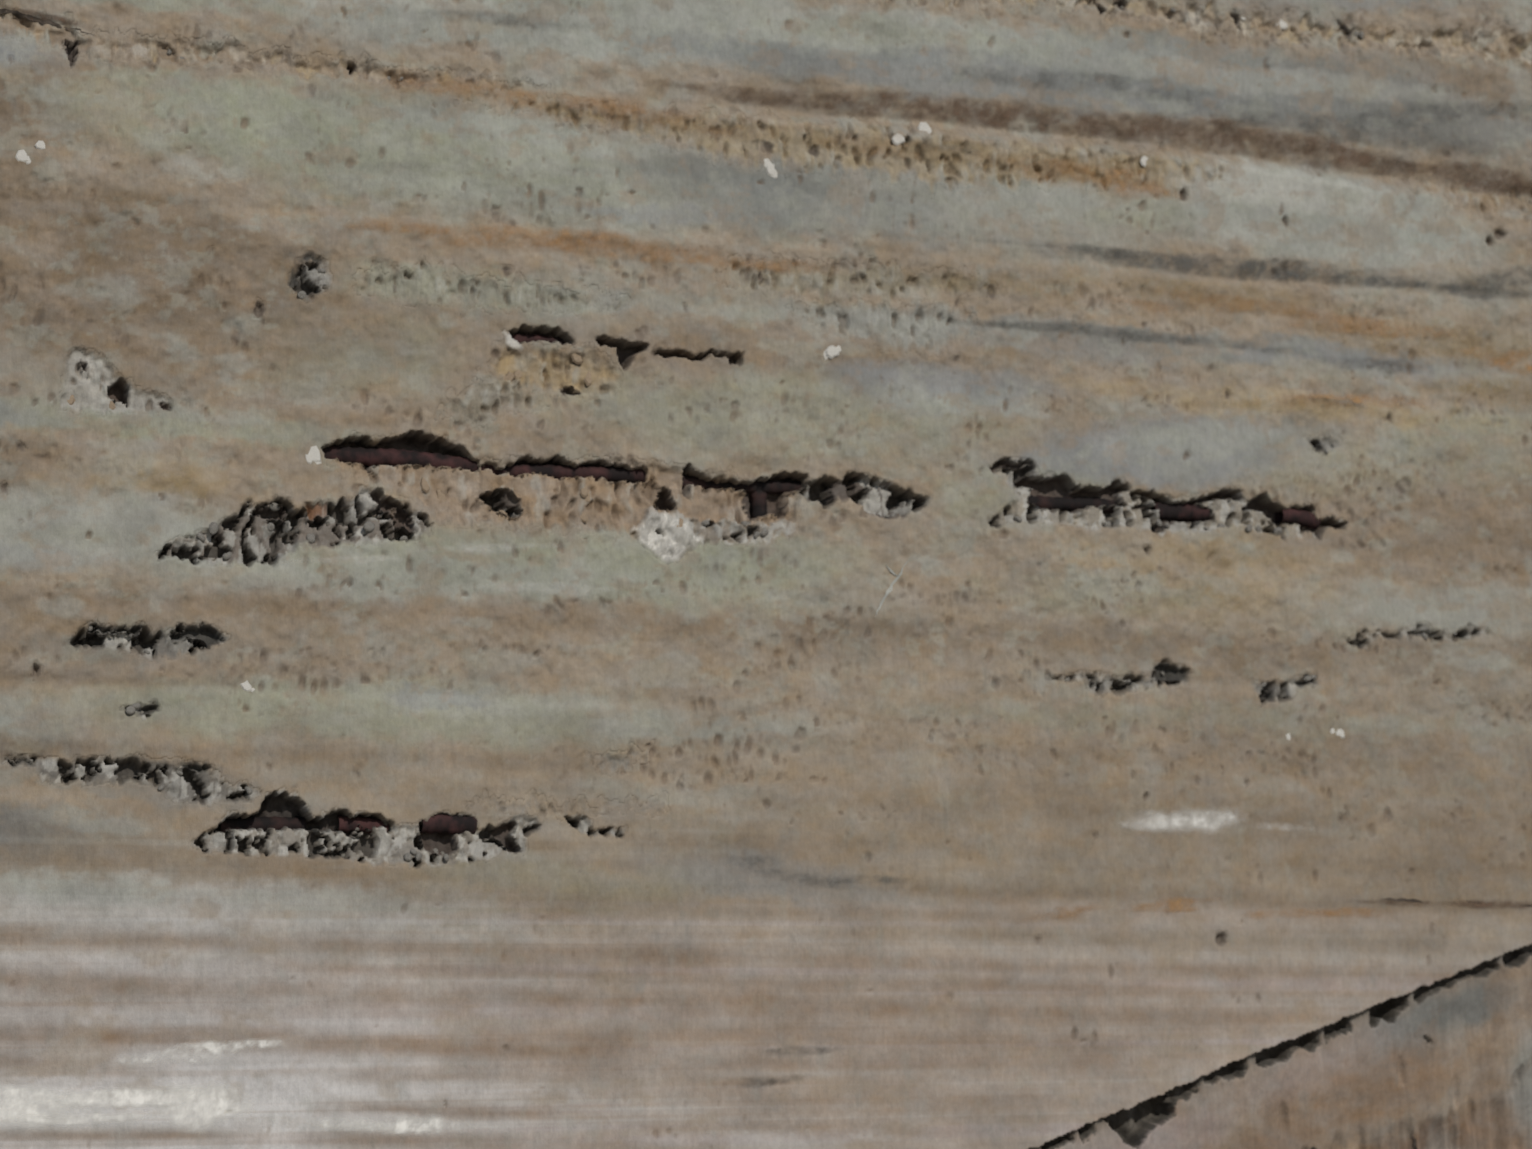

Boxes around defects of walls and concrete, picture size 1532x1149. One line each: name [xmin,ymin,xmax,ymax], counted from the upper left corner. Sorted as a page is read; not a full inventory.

spalling [58,346,173,418]
spalling [305,255,933,565]
spalling [986,457,1349,556]
spalling [190,787,542,870]
spalling [562,813,628,839]